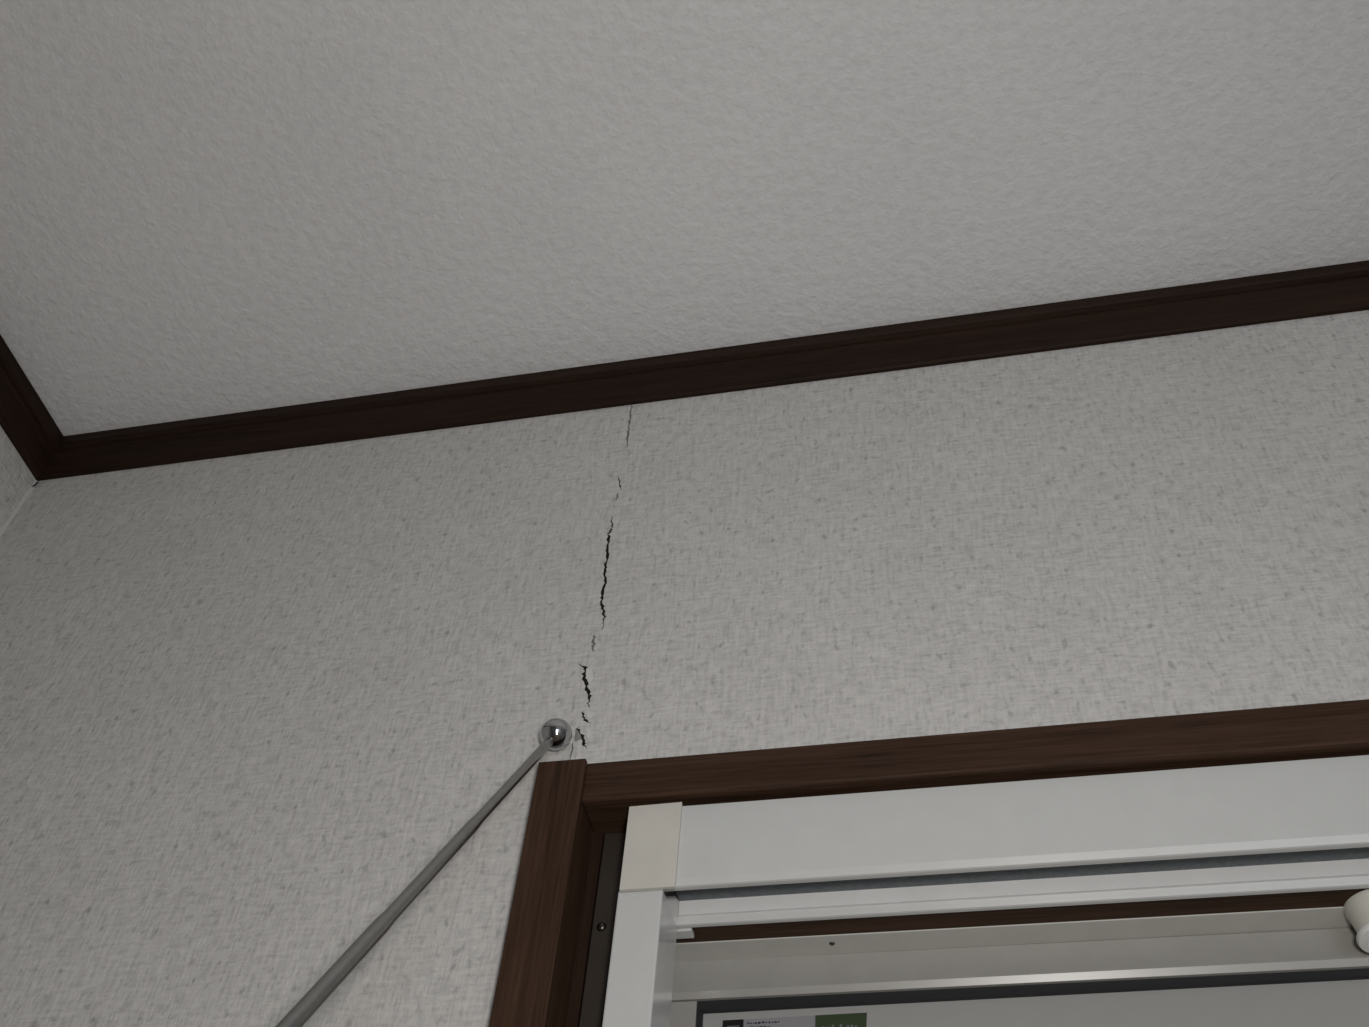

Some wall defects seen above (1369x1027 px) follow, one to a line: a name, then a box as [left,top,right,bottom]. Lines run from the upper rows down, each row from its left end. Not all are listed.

crack [570,405,633,760]